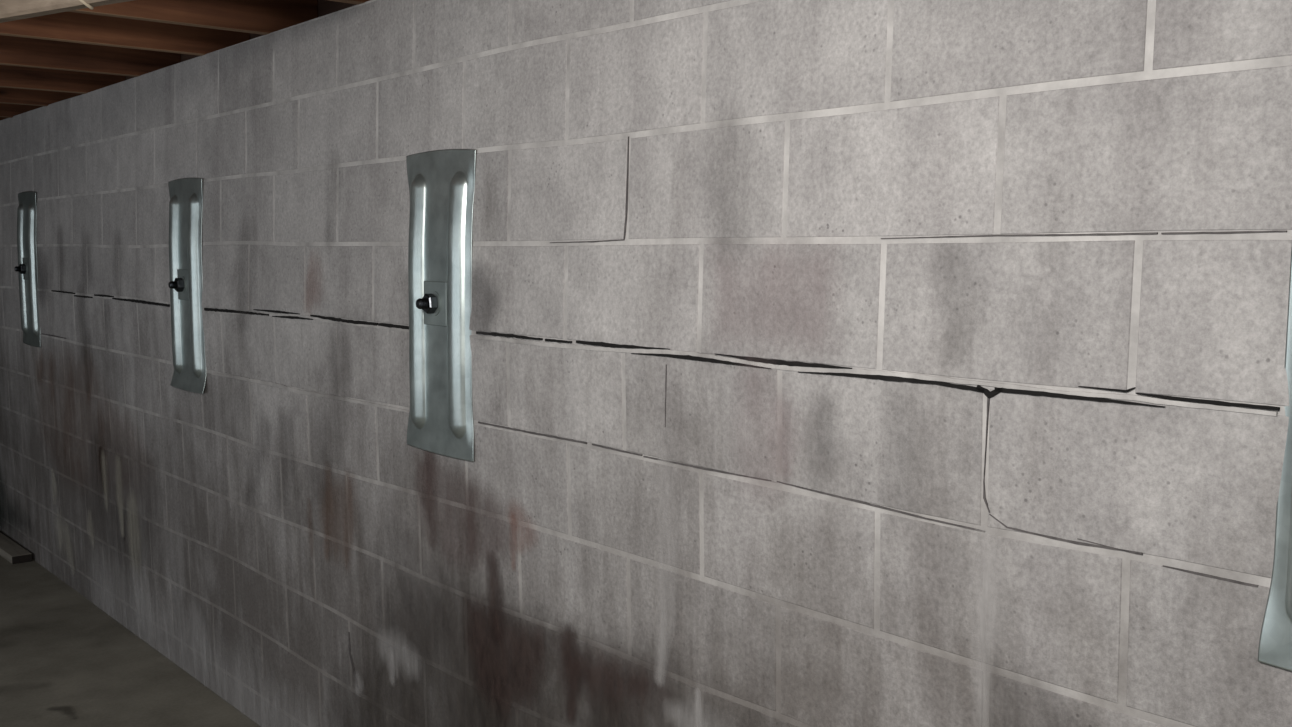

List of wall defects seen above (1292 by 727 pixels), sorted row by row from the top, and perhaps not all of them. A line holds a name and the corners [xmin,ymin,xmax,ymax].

crack [51,290,170,307]
crack [204,308,409,329]
crack [476,331,1280,587]